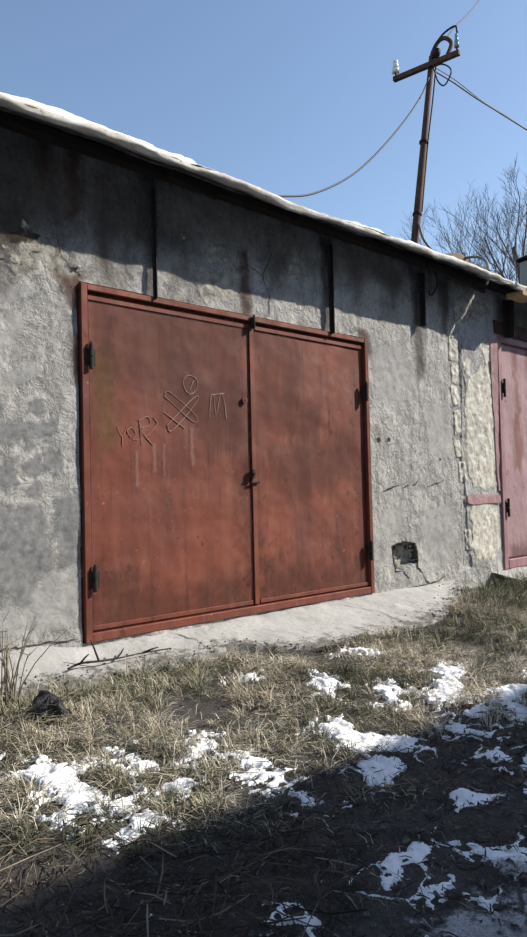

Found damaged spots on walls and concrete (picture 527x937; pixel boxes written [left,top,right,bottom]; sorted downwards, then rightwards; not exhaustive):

crack [0,239,83,278]
peeling [449,335,497,491]
crack [383,481,442,492]
peeling [465,503,501,563]
flaking render [392,544,410,567]